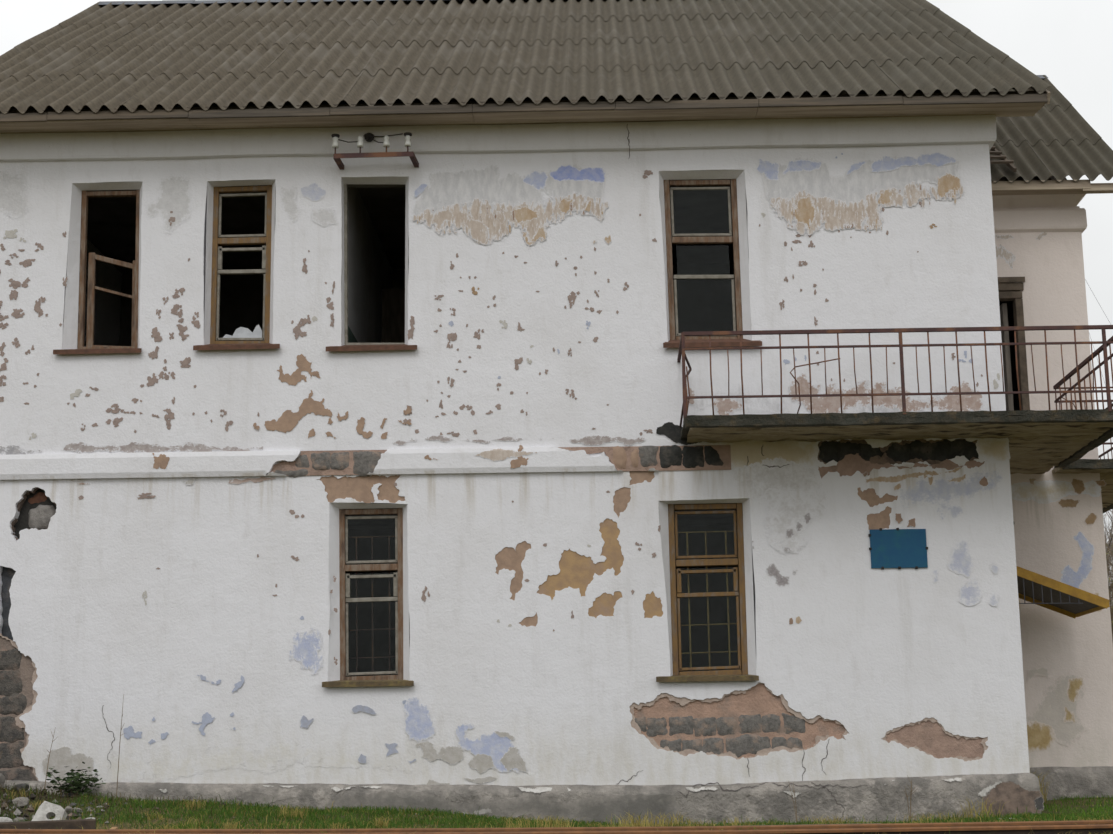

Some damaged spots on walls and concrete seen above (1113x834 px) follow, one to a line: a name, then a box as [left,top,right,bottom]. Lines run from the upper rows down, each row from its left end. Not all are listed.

peeling [412,164,609,264]
peeling [757,152,964,302]
peeling [0,229,48,402]
peeling [81,288,200,431]
peeling [228,354,419,485]
peeling [426,295,528,417]
spalling [11,488,57,540]
peeling [495,429,731,618]
peeling [818,442,985,530]
flaking render [0,567,35,747]
flaking render [633,684,845,758]
flaking render [886,720,984,759]